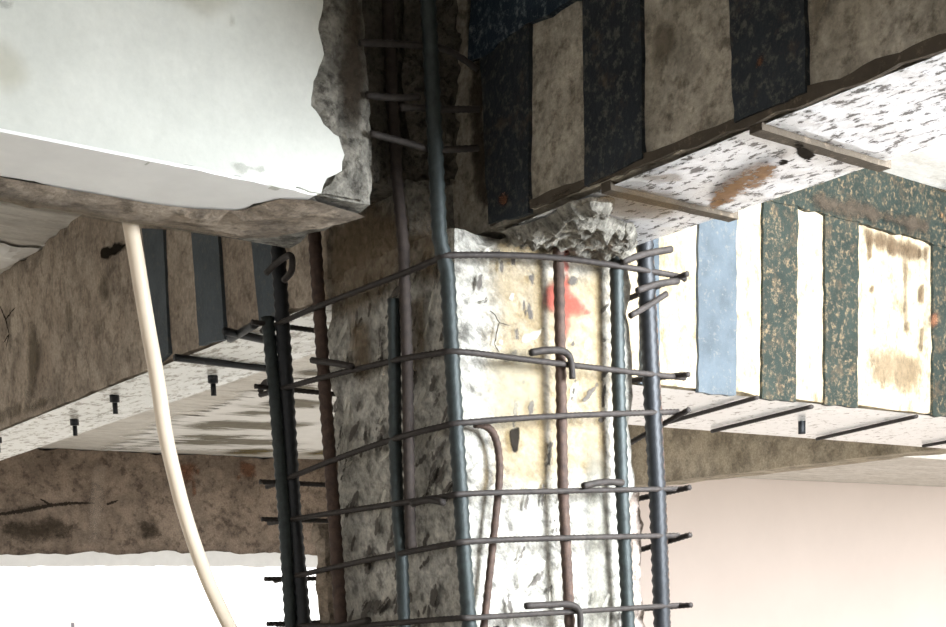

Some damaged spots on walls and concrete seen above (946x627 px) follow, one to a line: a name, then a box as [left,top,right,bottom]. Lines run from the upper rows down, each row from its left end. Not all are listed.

spalling [401,0,429,177]
spalling [436,0,462,180]
corrosion [709,165,779,209]
spalling [500,196,638,261]
crack [0,499,118,516]
flaking render [0,550,194,567]
flaking render [205,551,281,567]
spalling [305,523,335,624]
spalling [629,492,645,627]